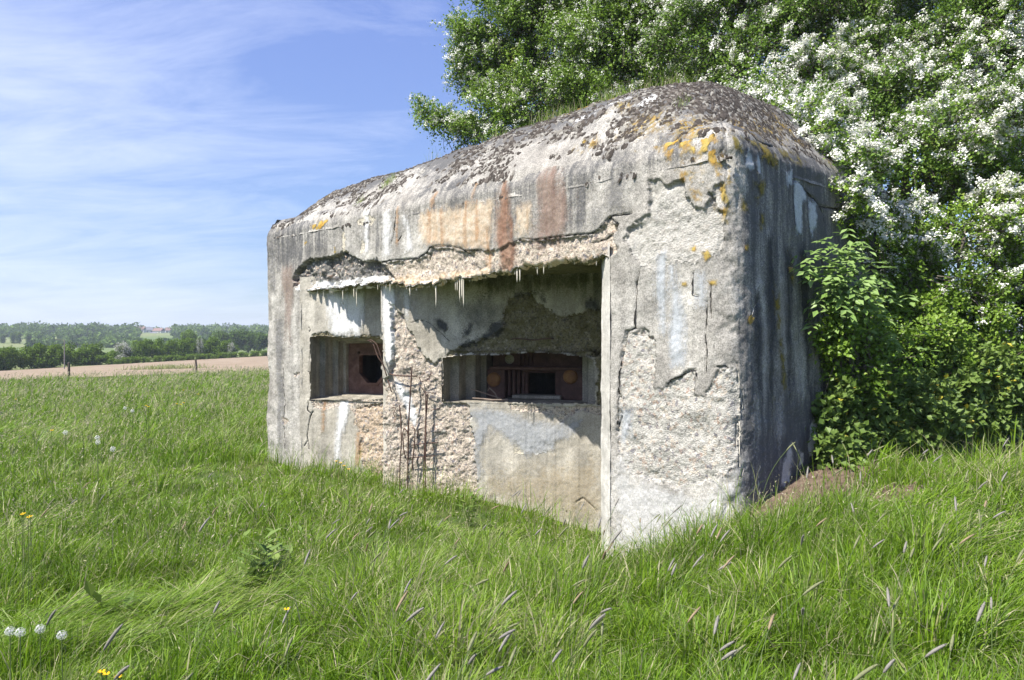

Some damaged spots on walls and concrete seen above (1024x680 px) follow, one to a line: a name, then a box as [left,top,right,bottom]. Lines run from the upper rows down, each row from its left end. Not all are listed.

corrosion [488,181,515,271]
flaking render [293,179,726,288]
damp [745,148,761,173]
damp [786,171,818,236]
damp [753,239,830,437]
spalling [311,291,601,495]
spalling [616,328,742,488]